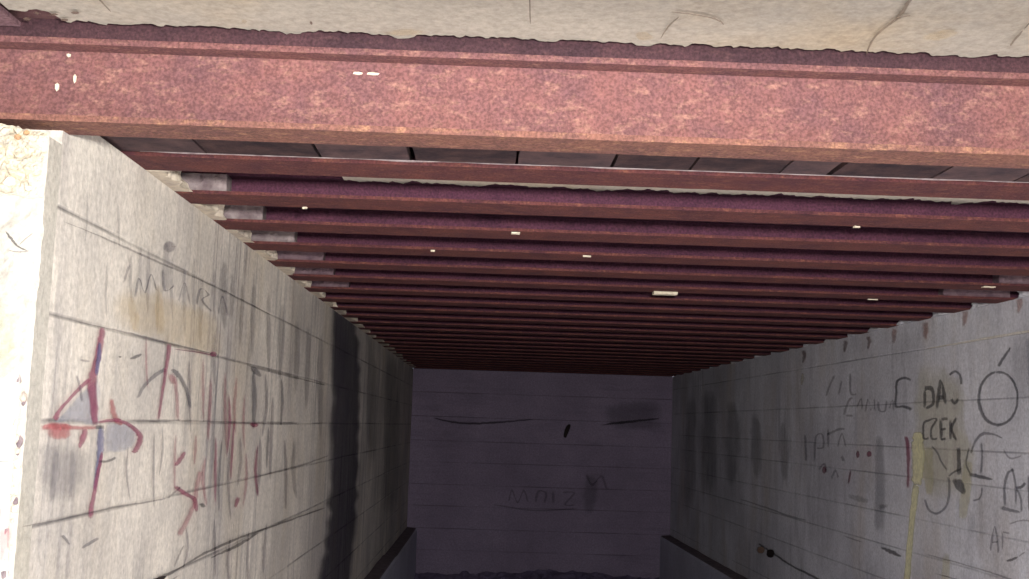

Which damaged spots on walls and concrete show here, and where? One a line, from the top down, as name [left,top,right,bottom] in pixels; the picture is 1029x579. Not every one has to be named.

spalling [0,123,48,198]